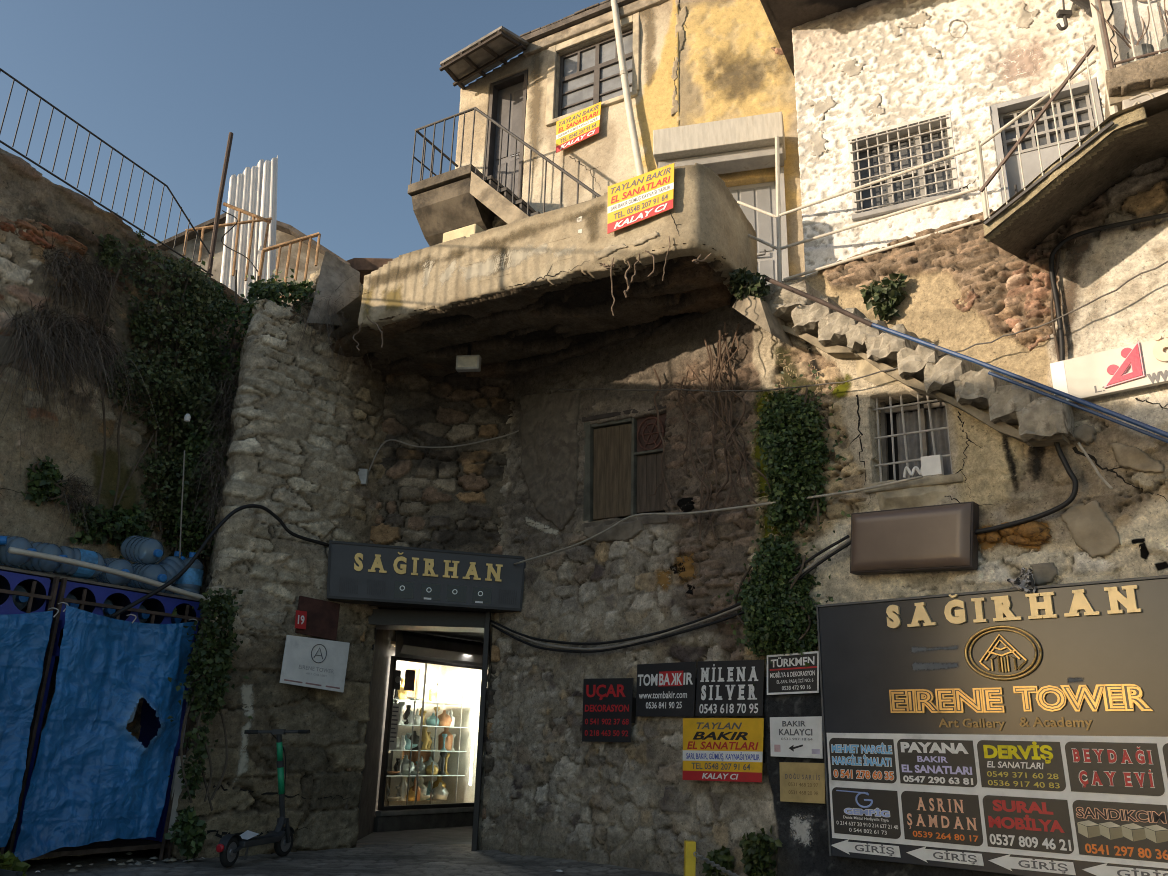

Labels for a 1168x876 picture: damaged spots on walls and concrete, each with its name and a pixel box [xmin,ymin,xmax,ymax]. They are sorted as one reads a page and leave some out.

crack [1107,0,1118,67]
leakage [707,57,763,99]
spalling [952,285,980,313]
spalling [995,249,1062,351]
crack [850,394,871,503]
peeling [1060,501,1168,571]